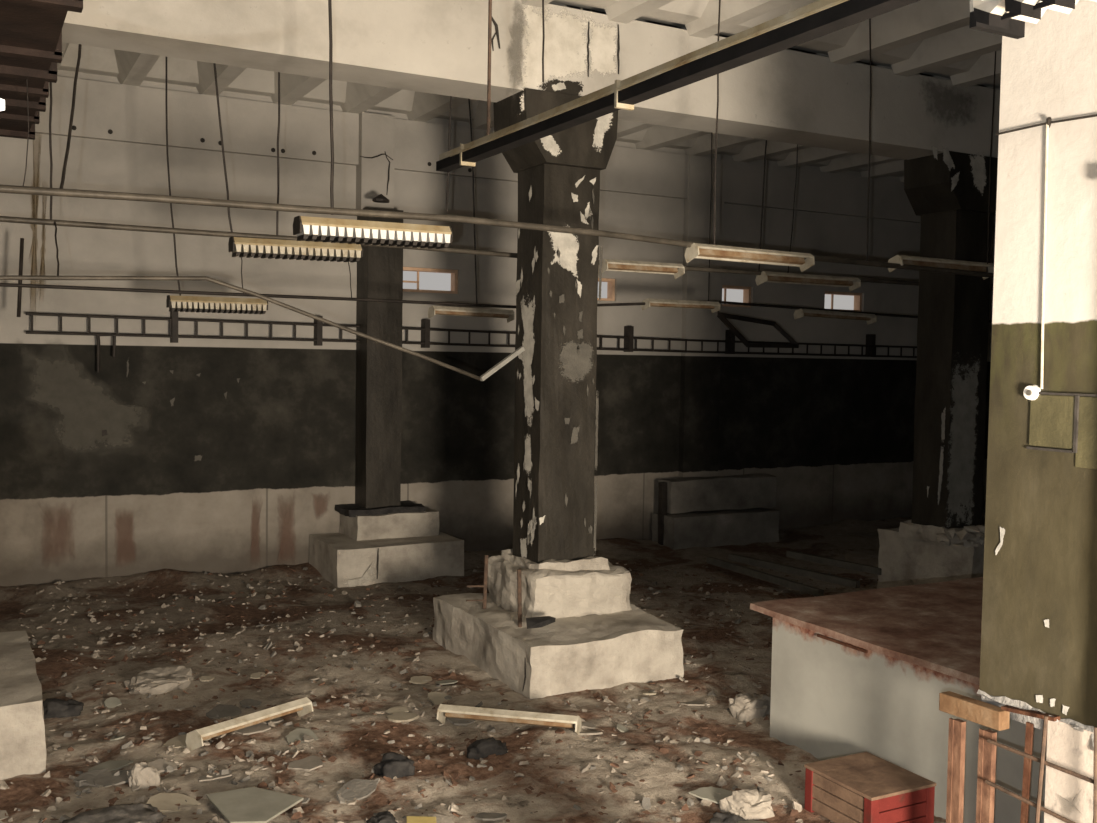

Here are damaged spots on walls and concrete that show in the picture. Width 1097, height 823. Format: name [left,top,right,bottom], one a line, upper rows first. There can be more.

peeling [541,135,562,157]
peeling [571,177,596,229]
peeling [592,113,613,152]
peeling [932,146,987,196]
peeling [547,225,603,300]
peeling [516,249,545,627]
peeling [549,291,599,557]
peeling [927,352,980,527]
peeling [1035,695,1084,732]
corrosion [1001,705,1060,823]